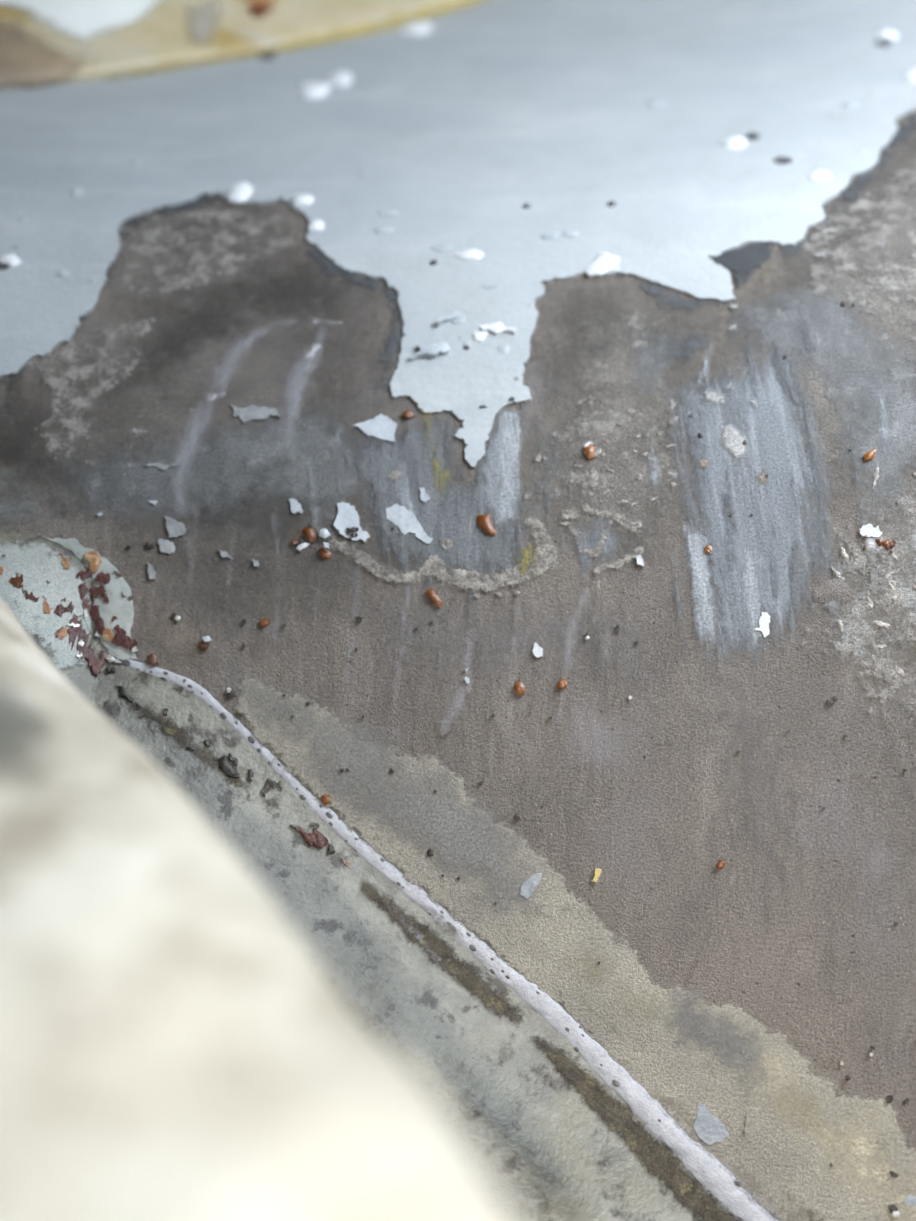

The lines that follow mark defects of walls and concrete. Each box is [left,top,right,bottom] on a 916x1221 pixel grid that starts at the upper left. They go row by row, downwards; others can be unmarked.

peeling [522,115,916,568]
damp [698,360,731,404]
peeling [0,194,433,627]
damp [376,463,416,552]
peeling [477,513,498,536]
damp [724,344,840,643]
damp [675,500,714,641]
peeling [148,653,159,667]
peeling [198,635,212,651]
peeling [532,643,543,658]
peeling [755,612,771,638]
corrosion [289,823,351,866]